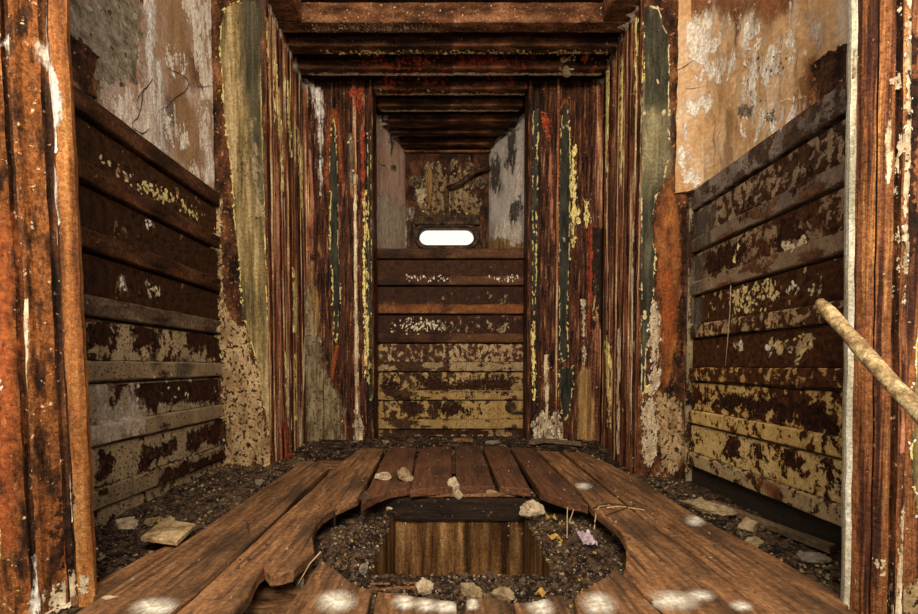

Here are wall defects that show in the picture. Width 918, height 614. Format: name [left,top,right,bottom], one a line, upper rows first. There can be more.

spalling [70,0,143,105]
crack [132,68,213,134]
peeling [162,104,190,151]
peeling [165,42,188,78]
peeling [684,5,806,143]
peeling [885,0,914,274]
peeling [208,0,691,475]
peeling [728,278,822,314]
peeling [765,332,814,366]